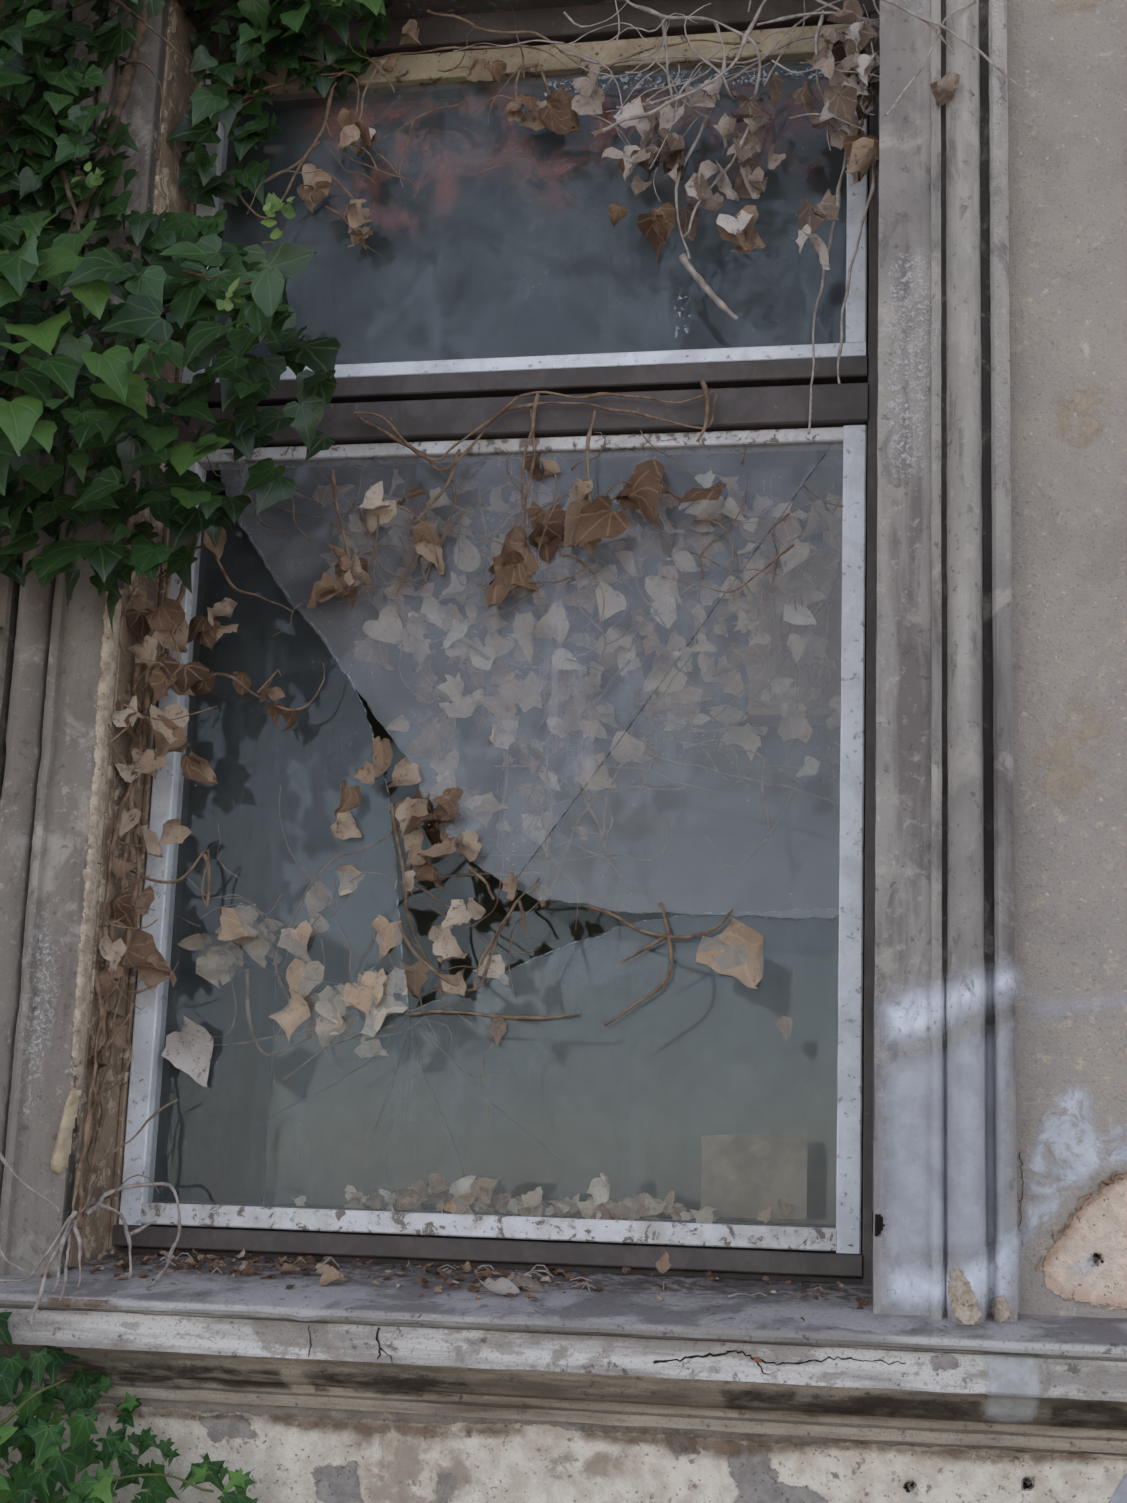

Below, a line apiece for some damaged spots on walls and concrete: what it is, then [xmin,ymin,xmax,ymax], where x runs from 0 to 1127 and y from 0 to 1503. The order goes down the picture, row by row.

water stain [887,1039,1127,1308]
flaking render [1036,1170,1127,1310]
crack [653,1350,905,1375]
flaking render [0,1402,1127,1503]